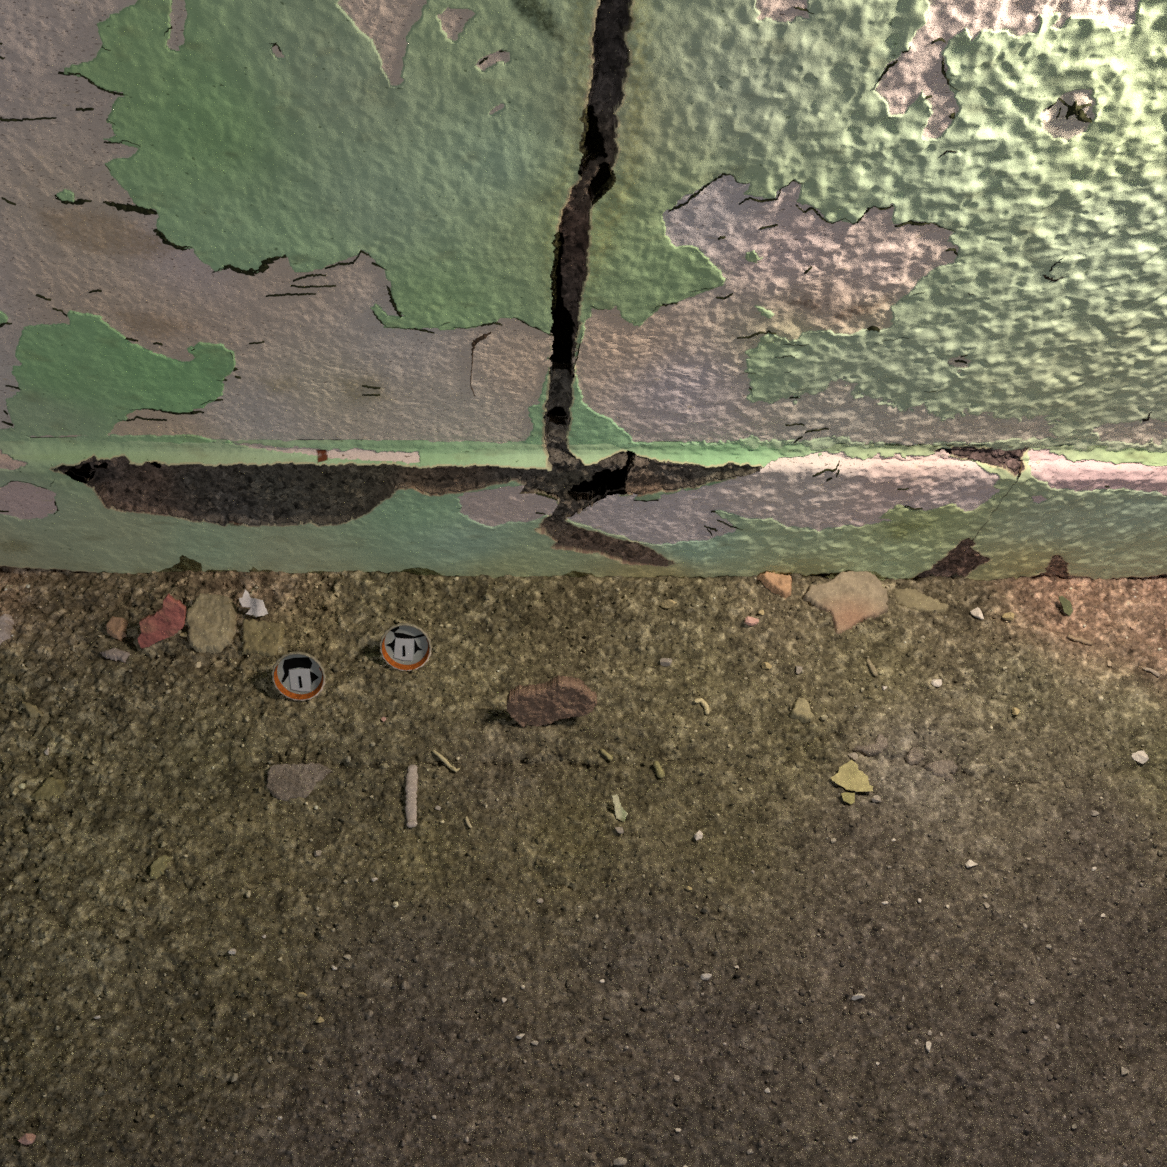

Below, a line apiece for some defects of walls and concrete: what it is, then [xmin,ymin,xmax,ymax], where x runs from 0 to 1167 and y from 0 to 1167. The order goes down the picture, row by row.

peeling [0,0,1167,545]
crack [517,0,668,562]